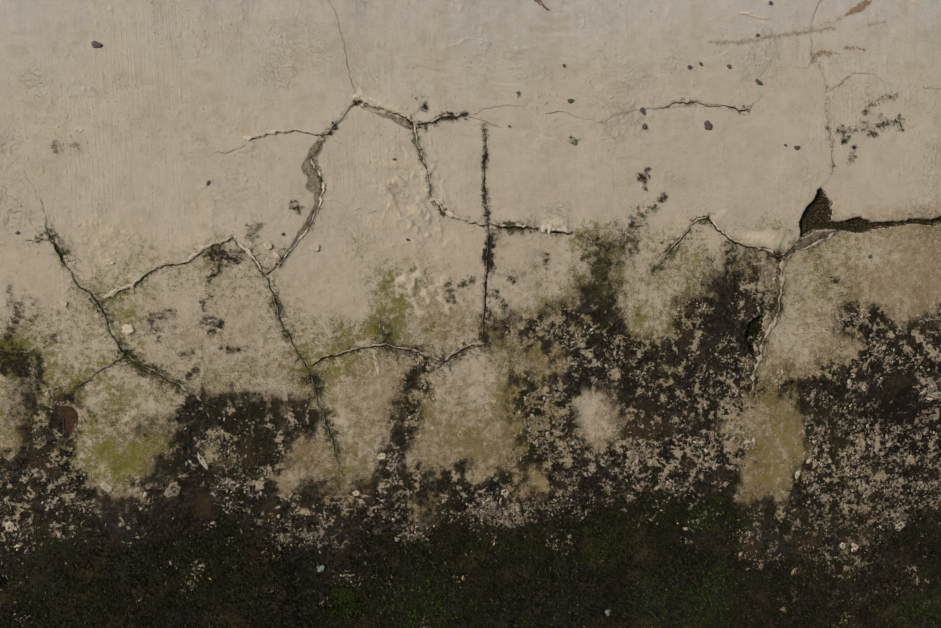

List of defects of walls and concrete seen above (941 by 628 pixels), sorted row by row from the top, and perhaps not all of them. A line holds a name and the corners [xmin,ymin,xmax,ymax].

crack [547,94,763,123]
crack [23,1,596,482]
crack [647,213,843,395]
spalling [789,188,941,253]
damp [0,167,941,628]